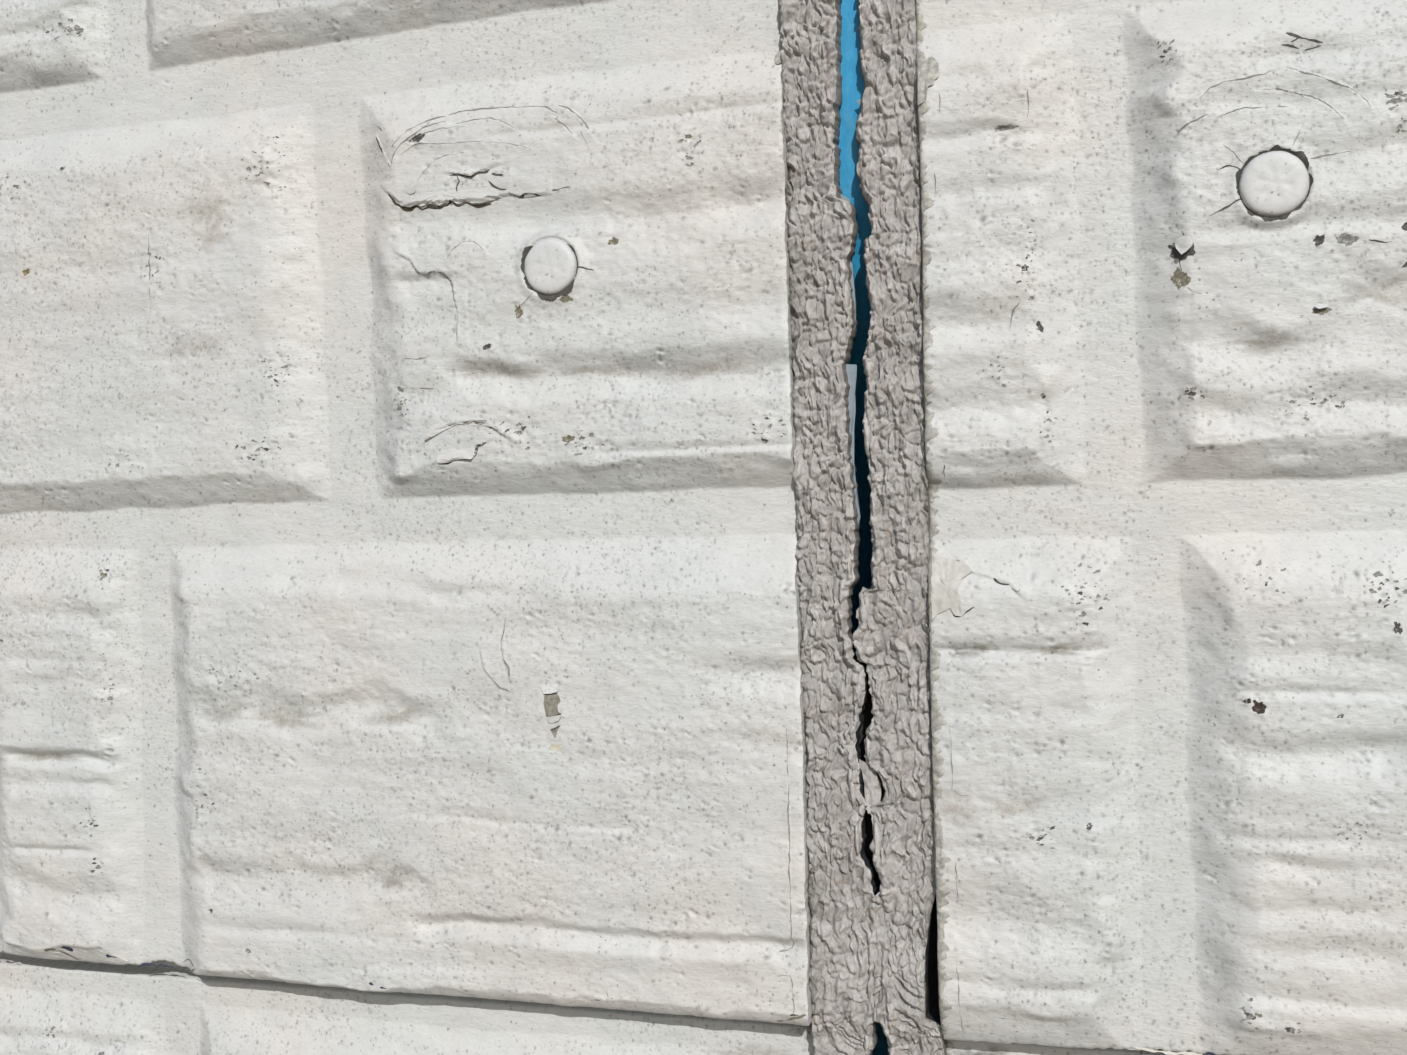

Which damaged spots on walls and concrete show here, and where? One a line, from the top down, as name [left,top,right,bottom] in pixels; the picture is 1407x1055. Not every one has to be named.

peeling [389,166,566,211]
crack [833,0,885,893]
peeling [540,684,562,751]
crack [926,896,943,1025]
crack [870,1022,889,1055]